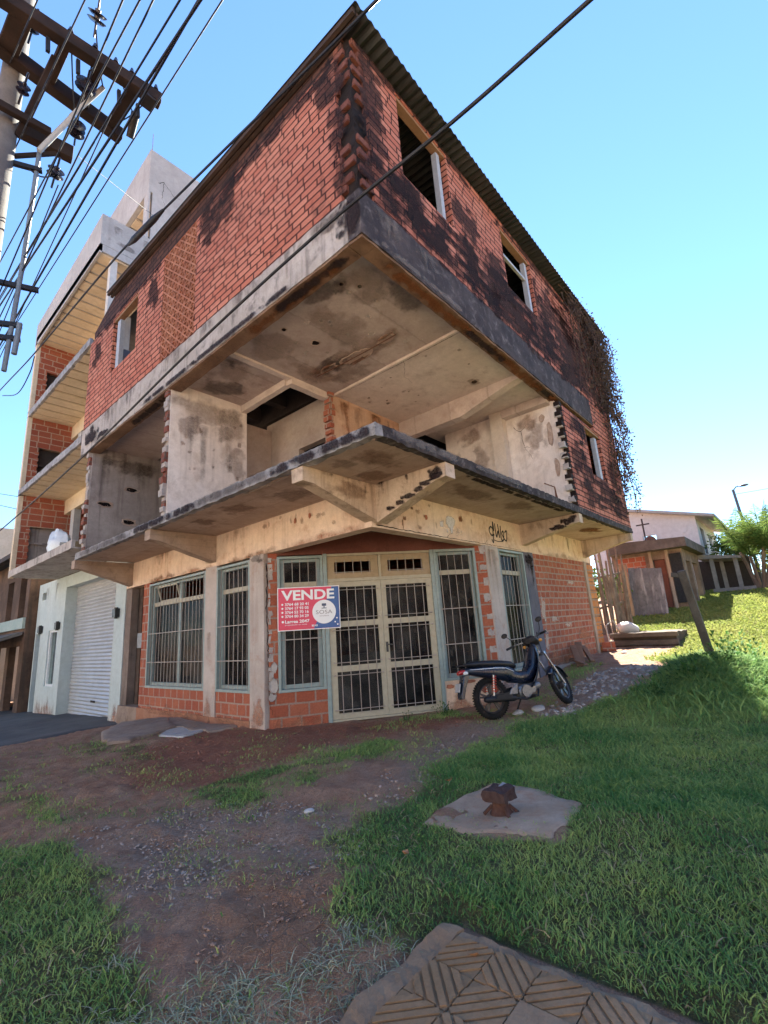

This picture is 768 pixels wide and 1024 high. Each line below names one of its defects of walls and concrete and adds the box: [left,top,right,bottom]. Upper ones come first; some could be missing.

leakage [197,58,360,247]
leakage [355,40,609,421]
flaking render [539,414,560,497]
flaking render [268,662,279,702]